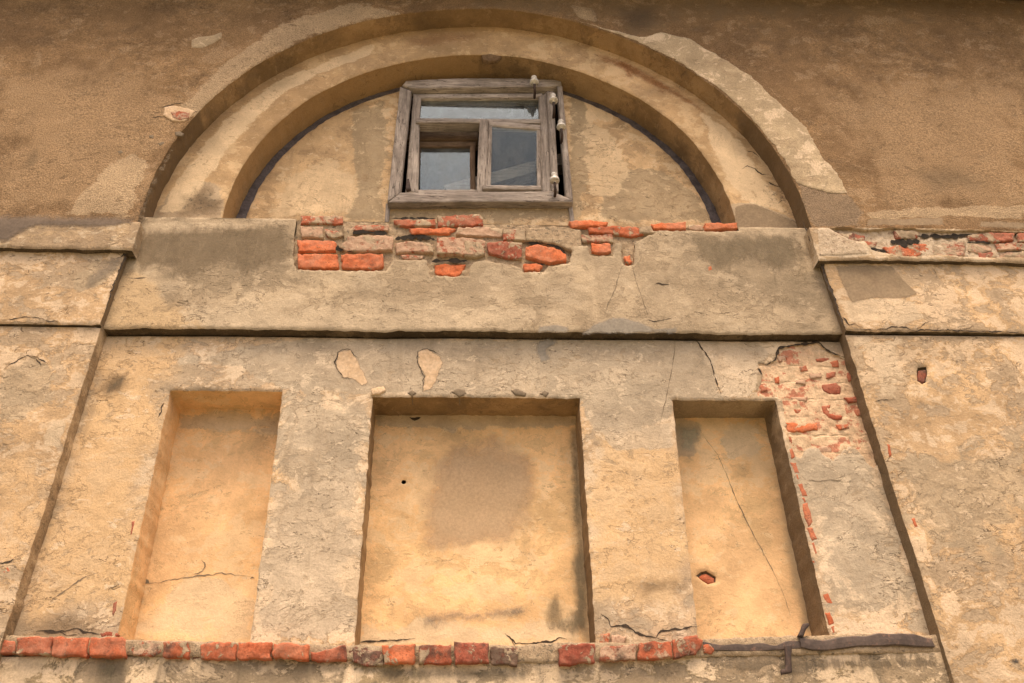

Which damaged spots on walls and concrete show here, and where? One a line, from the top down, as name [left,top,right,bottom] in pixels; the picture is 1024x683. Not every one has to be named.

spalling [149,106,195,146]
spalling [293,214,738,277]
spalling [829,226,1024,258]
peeling [334,349,386,395]
peeling [408,349,443,405]
crack [659,341,721,425]
peeling [756,341,876,563]
crack [146,562,254,584]
crack [601,614,697,641]
spalling [823,593,835,633]